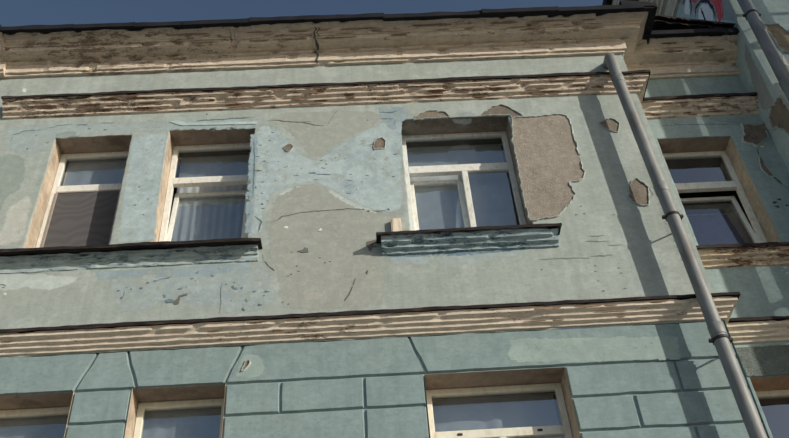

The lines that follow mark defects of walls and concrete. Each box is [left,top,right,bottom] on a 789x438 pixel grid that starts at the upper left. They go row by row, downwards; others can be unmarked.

crack [312,27,320,63]
spalling [764,23,789,67]
peeling [76,94,160,113]
peeling [174,90,264,107]
peeling [401,80,506,98]
peeling [526,76,603,95]
flaking render [740,43,789,148]
spalling [410,104,586,222]
flaking render [5,114,404,242]
spalling [627,178,653,207]
spalling [235,354,265,378]